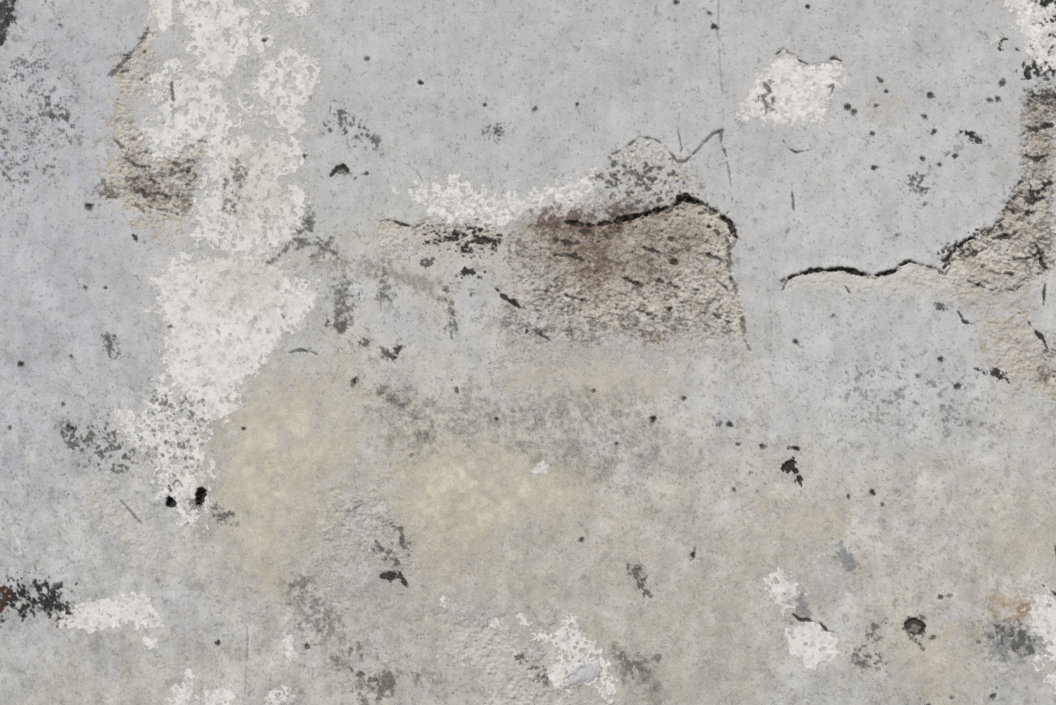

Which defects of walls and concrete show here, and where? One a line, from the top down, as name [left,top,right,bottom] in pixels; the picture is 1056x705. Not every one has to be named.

peeling [77,0,324,568]
flaking render [361,134,760,381]
peeling [733,47,857,129]
crack [783,261,972,324]
flaking render [937,0,1056,406]